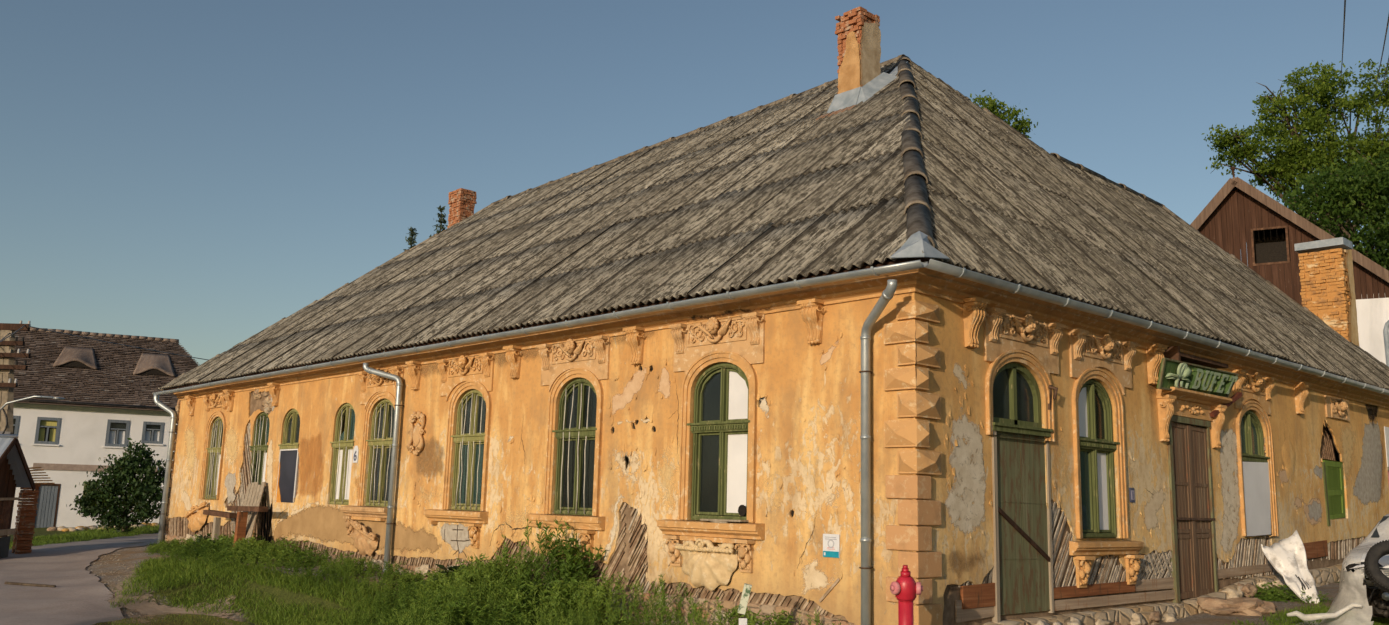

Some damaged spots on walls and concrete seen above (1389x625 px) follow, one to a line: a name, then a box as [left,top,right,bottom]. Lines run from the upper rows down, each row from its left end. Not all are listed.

peeling [609,444,670,586]
peeling [608,359,675,425]
peeling [944,363,992,540]
peeling [1218,421,1241,562]